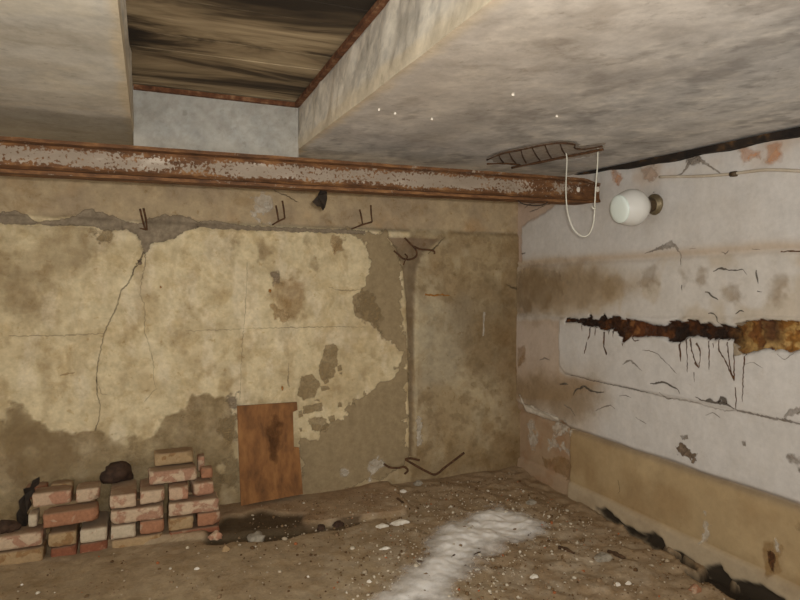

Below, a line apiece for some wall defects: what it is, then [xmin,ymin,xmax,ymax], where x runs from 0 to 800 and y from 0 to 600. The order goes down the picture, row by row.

spalling [486,141,605,169]
peeling [680,156,720,175]
crack [95,256,143,429]
flaking render [0,201,465,495]
rust [566,314,800,409]
crack [735,409,800,424]